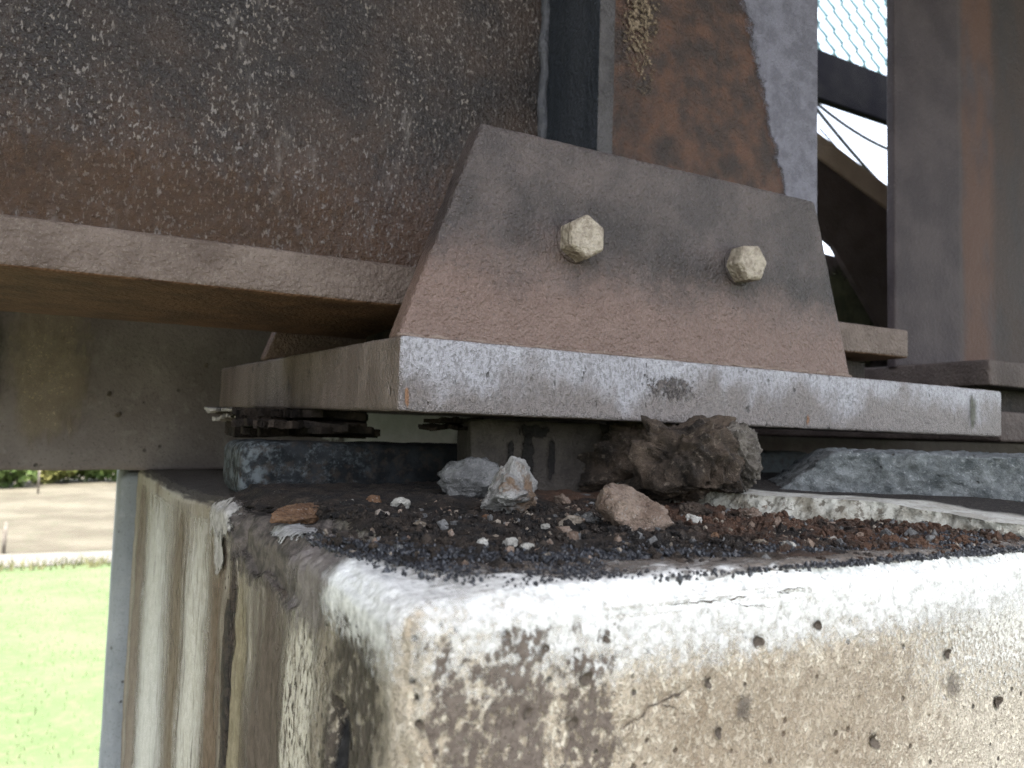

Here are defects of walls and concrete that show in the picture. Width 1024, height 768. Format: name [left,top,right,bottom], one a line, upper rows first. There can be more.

corrosion [622,0,661,103]
water stain [133,498,166,768]
water stain [175,522,208,768]
water stain [279,602,382,768]
crack [620,686,690,740]